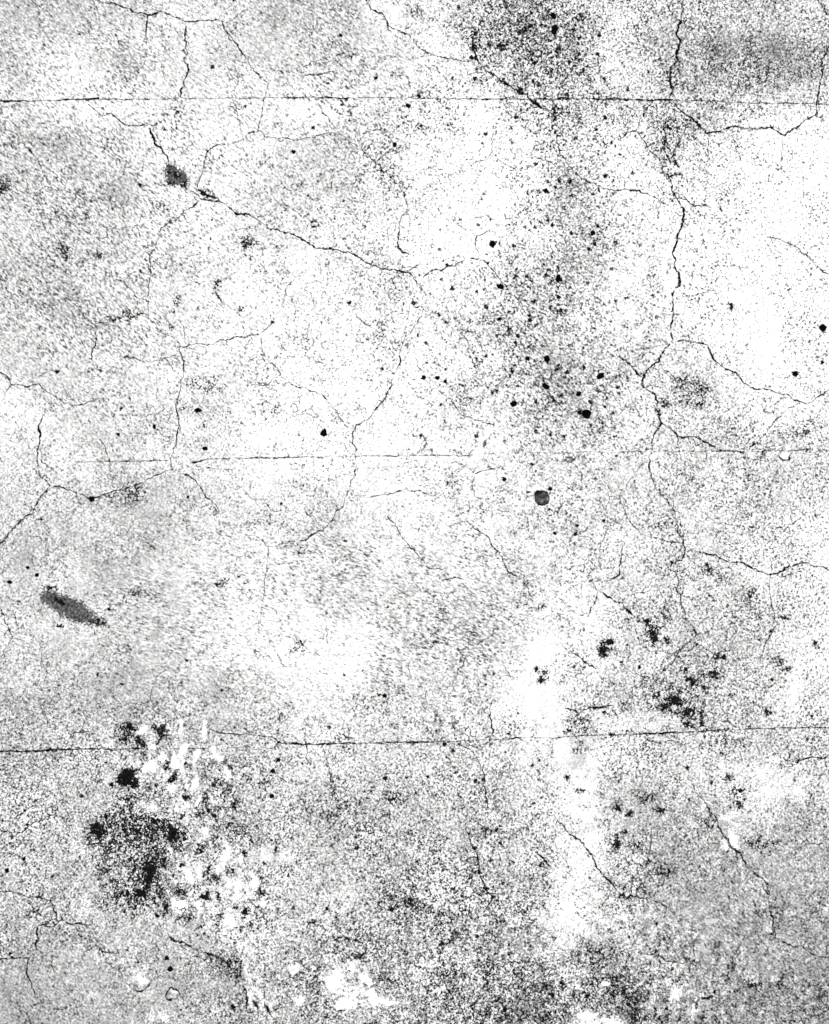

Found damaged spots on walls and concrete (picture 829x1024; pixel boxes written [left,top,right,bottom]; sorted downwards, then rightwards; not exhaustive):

damp [163,161,216,201]
crack [0,0,548,631]
crack [366,0,829,678]
damp [40,585,109,629]
crack [1,778,65,833]
crack [0,890,87,1013]
damp [84,722,296,926]
damp [305,869,420,927]
crack [455,700,667,917]
crack [687,779,828,975]